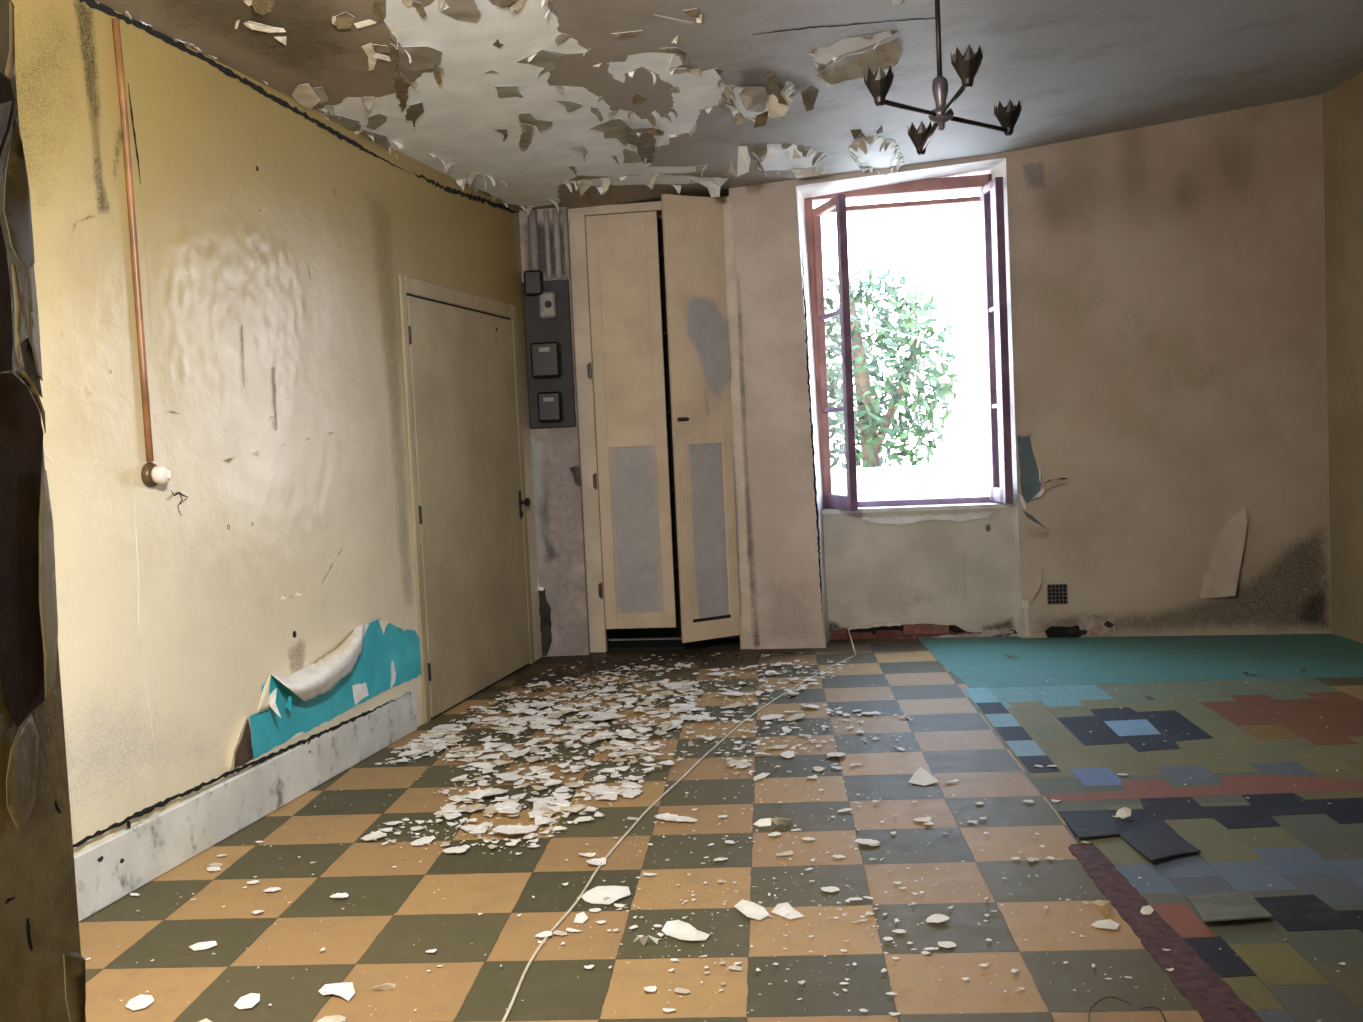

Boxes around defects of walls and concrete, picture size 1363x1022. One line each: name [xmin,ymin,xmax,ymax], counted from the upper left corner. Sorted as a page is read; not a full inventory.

peeling [235,0,286,45]
peeling [292,0,905,216]
flaking render [0,224,13,372]
peeling [231,618,421,769]
crack [73,695,404,848]